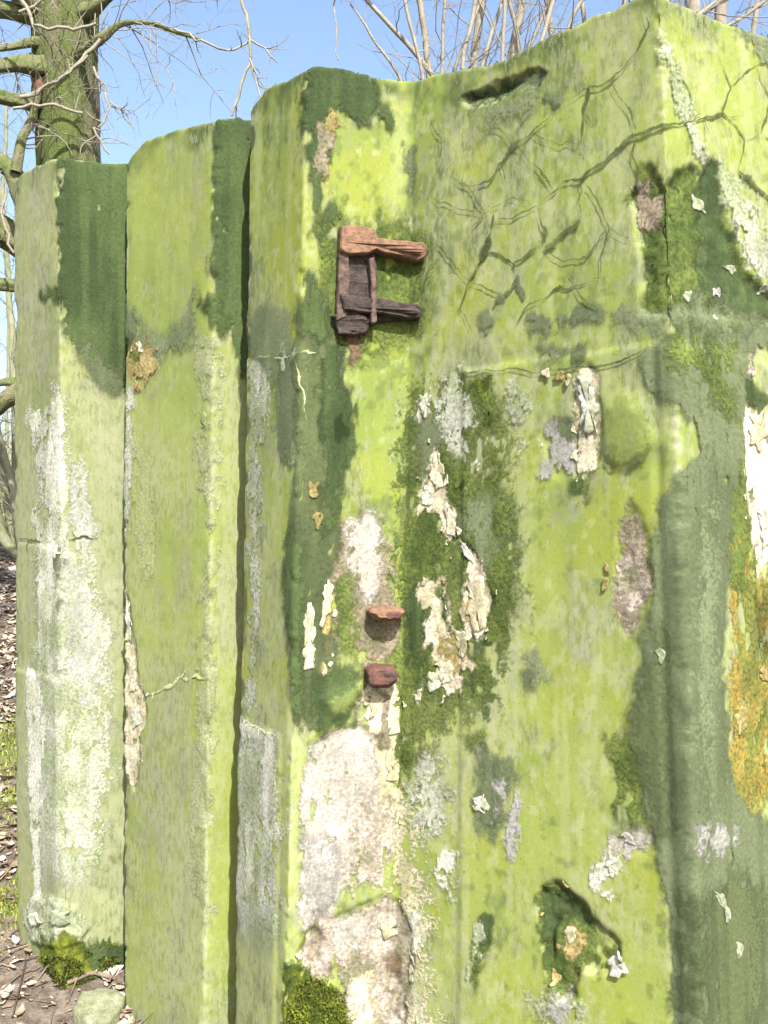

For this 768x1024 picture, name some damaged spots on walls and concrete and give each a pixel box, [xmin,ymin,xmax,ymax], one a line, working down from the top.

corrosion [313,207,437,368]
crack [422,9,768,332]
spalling [624,36,768,338]
peeling [23,379,149,945]
spalling [235,358,497,1024]
peeling [505,367,601,482]
spalling [602,498,656,637]
peeling [743,351,768,578]
peeling [471,778,523,861]